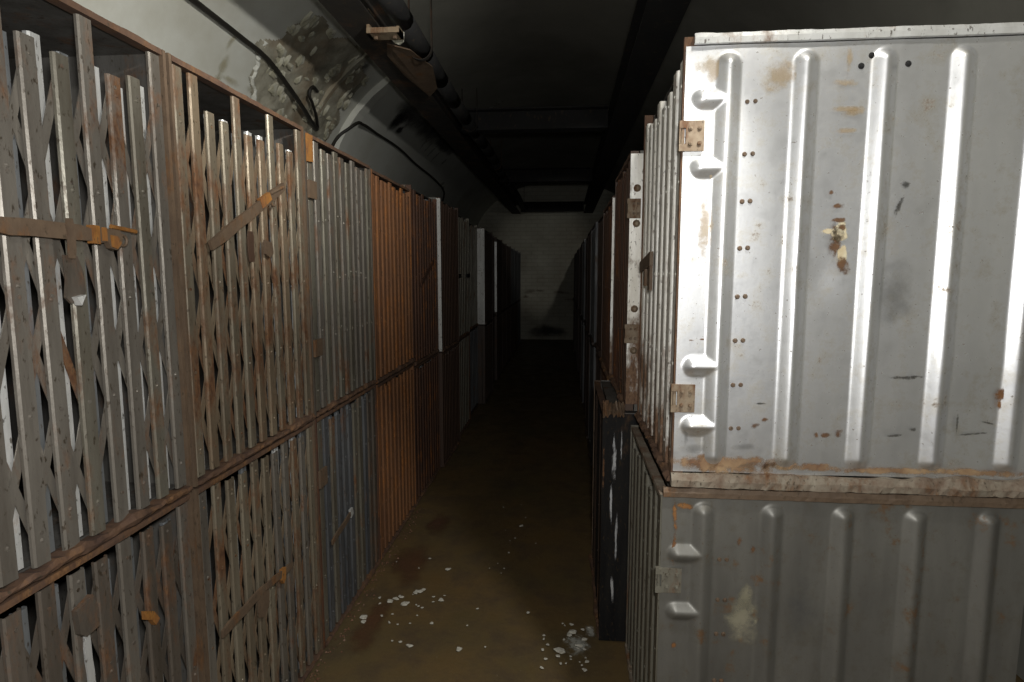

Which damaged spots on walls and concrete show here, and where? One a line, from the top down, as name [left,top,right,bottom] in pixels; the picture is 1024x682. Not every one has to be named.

peeling [248,11,369,140]